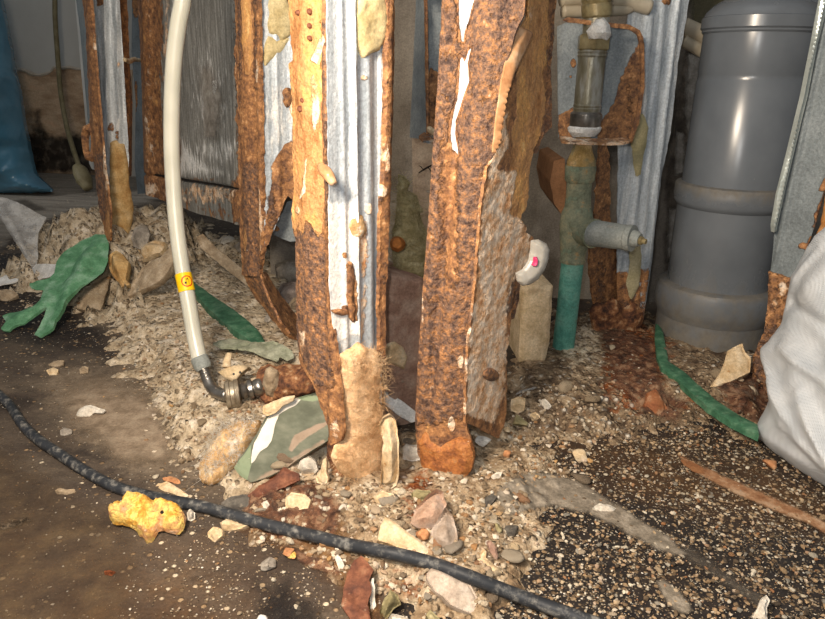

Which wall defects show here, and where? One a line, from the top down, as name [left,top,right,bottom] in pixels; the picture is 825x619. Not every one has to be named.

corrosion [81,123,94,162]
corrosion [282,88,292,107]
peeling [492,26,533,154]
corrosion [415,0,526,460]
corrosion [600,323,684,419]
corrosion [718,363,768,422]